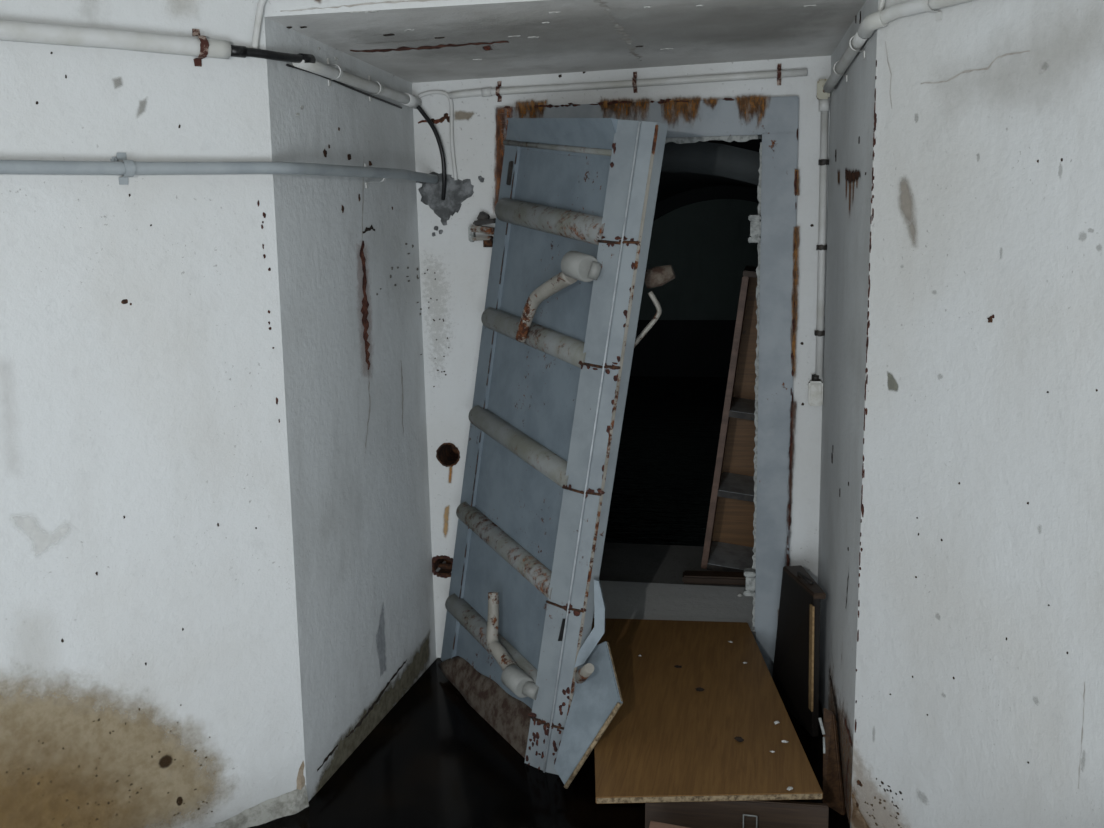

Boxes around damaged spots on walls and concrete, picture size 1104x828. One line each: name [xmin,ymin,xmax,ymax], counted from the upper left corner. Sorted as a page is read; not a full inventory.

rust [493,95,767,209]
rust [837,168,860,213]
rust [786,227,799,566]
leakage [0,680,217,828]